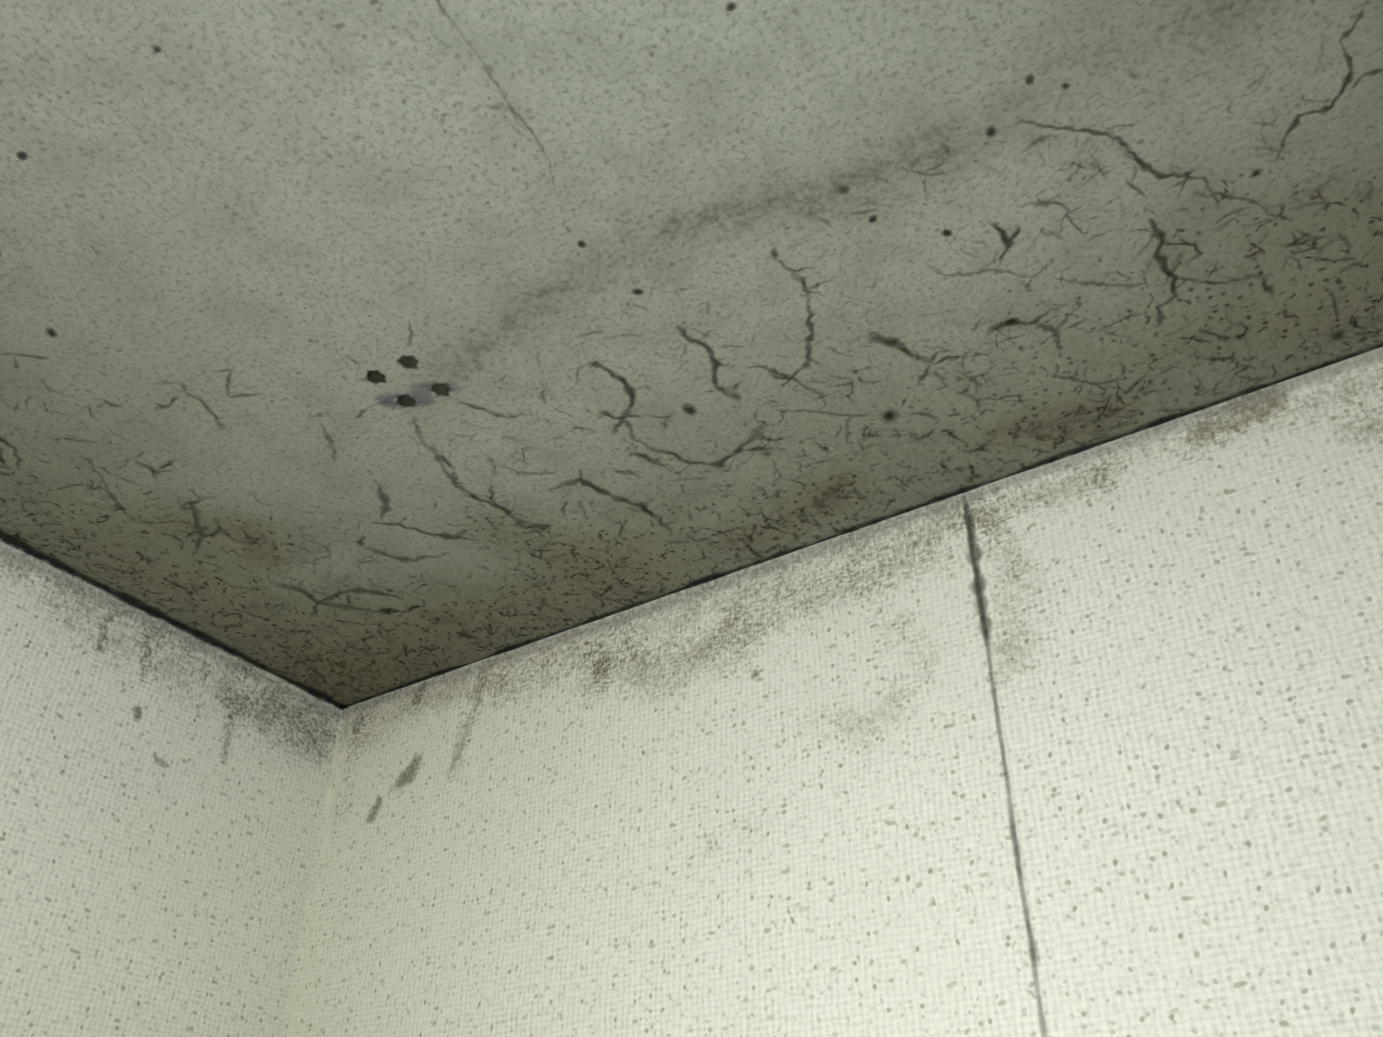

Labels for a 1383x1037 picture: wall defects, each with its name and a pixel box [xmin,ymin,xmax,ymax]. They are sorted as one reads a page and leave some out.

crack [1287,31,1380,133]
crack [1048,126,1180,192]
crack [756,251,813,388]
crack [994,226,1019,259]
crack [1152,222,1200,317]
water stain [0,178,1383,702]
crack [0,309,1383,710]